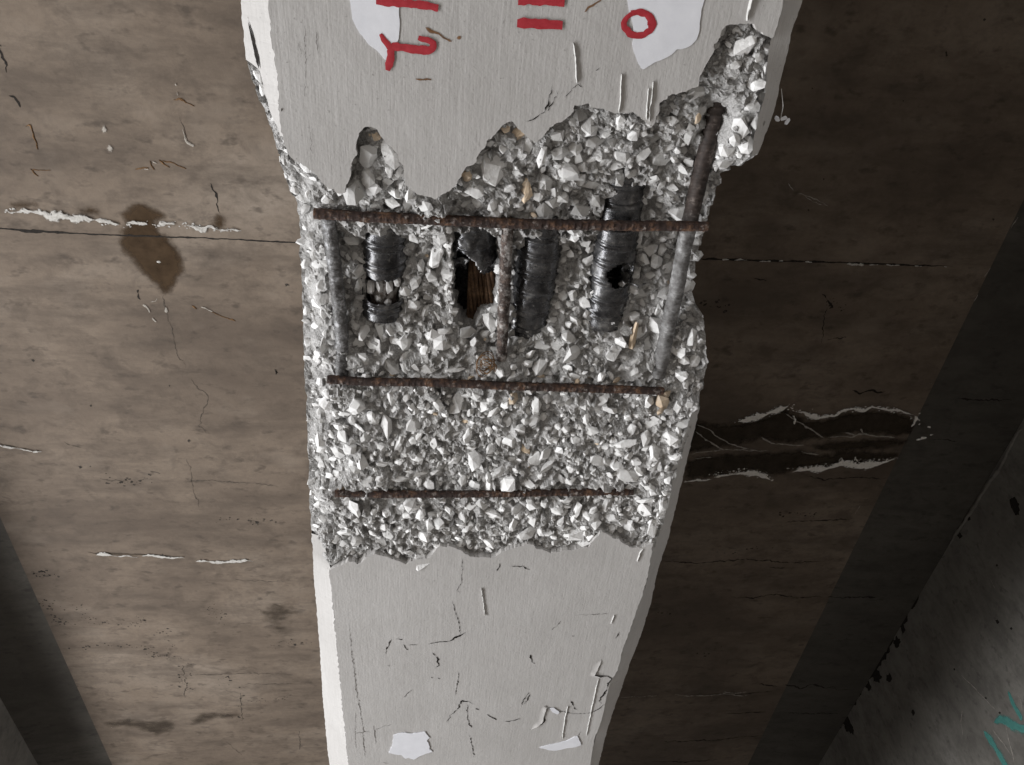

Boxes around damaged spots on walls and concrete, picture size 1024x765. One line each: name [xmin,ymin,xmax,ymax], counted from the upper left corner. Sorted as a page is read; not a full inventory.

peeling [350,0,400,60]
peeling [627,0,704,69]
leakage [5,204,240,293]
spalling [246,23,790,571]
crack [349,629,389,763]
peeling [389,731,432,760]
crack [386,560,530,757]
peeling [530,705,566,730]
peeling [539,733,581,751]
peeling [583,660,612,714]